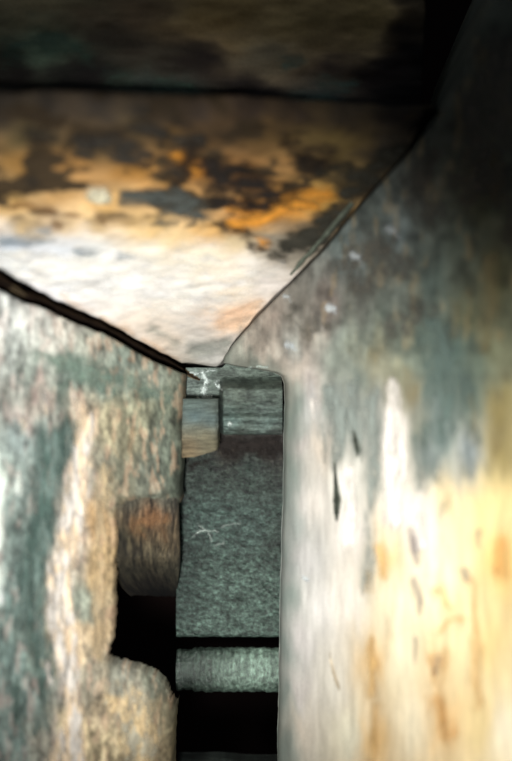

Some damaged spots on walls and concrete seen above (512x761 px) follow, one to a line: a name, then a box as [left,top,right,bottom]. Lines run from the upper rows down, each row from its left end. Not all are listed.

damp [0,238,35,246]
damp [72,123,295,226]
rust [227,189,333,228]
damp [213,142,409,262]